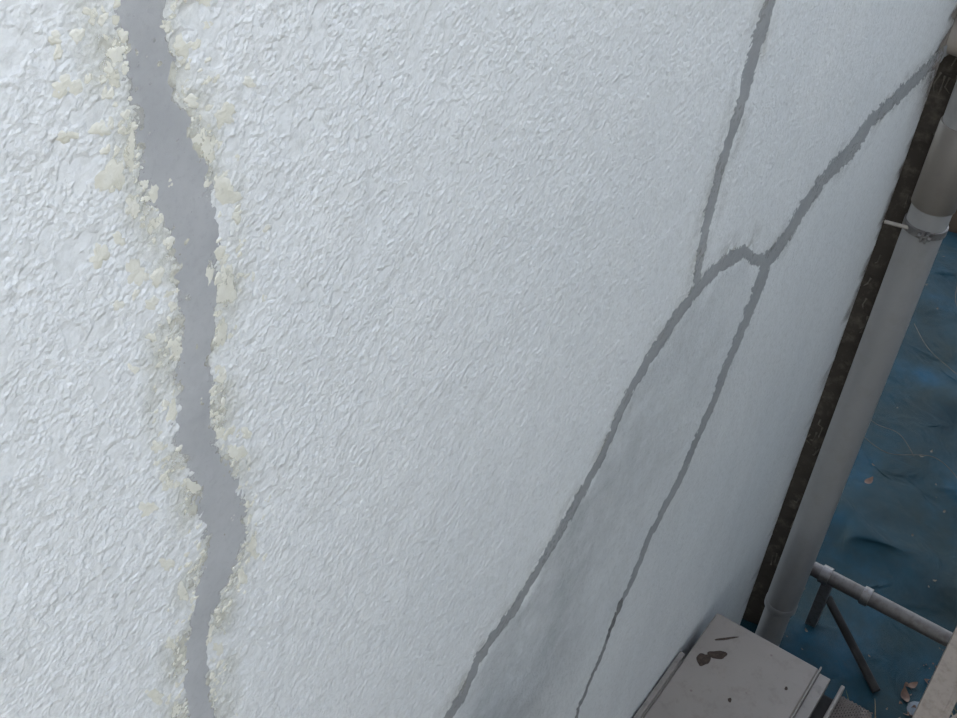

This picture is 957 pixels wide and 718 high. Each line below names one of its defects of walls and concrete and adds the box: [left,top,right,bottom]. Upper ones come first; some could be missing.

crack [48,0,271,718]
crack [444,0,949,718]